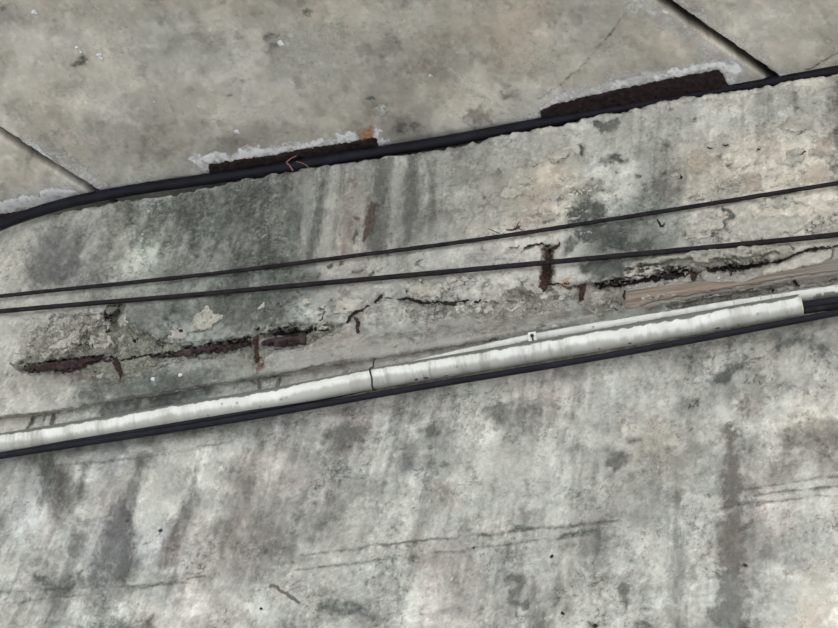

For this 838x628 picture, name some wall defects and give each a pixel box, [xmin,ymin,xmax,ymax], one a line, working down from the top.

water stain [528,24,749,120]
water stain [188,127,391,172]
efflorescence [0,187,82,214]
water stain [565,190,651,279]
crack [782,245,838,262]
spalling [404,245,782,323]
crack [345,291,497,323]
corrosion [22,356,115,374]
spalling [10,291,364,381]
corrosion [158,338,251,358]
corrosion [261,333,308,347]
water stain [707,424,797,628]